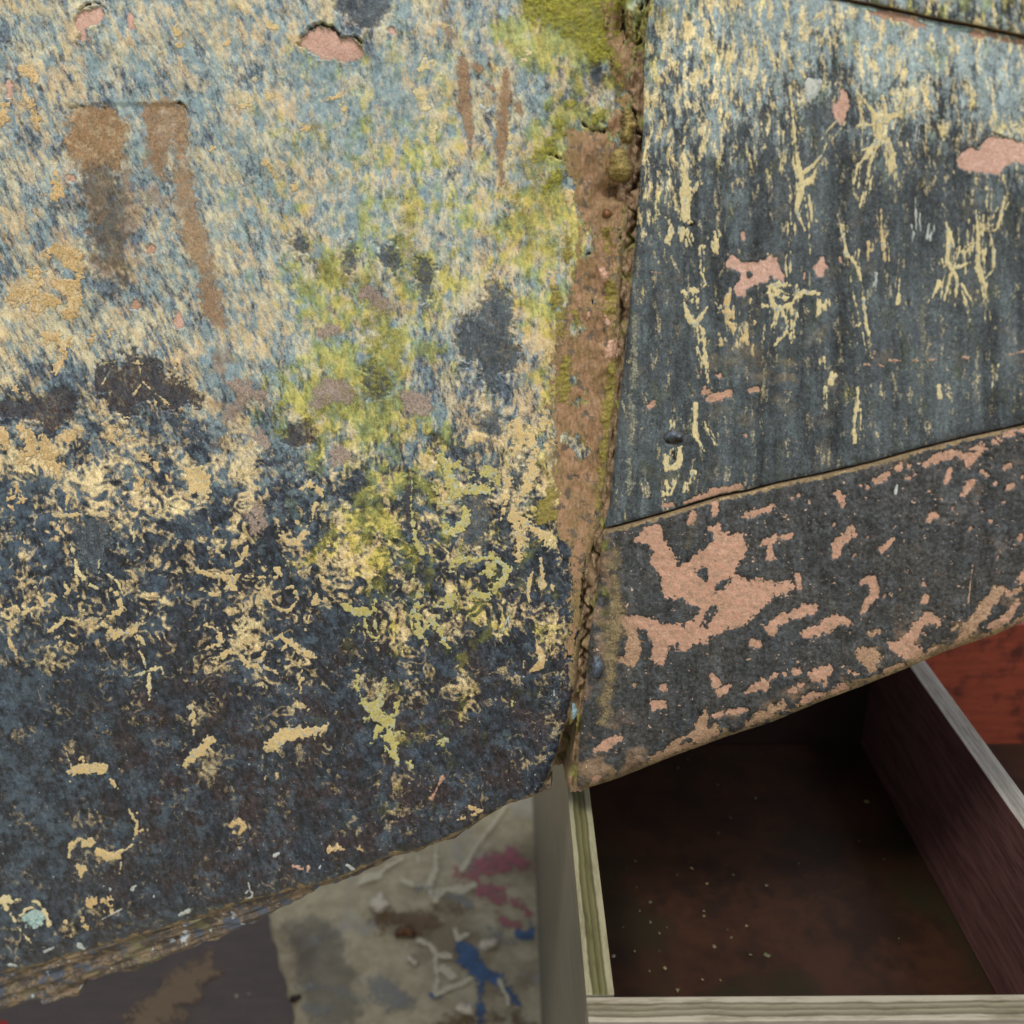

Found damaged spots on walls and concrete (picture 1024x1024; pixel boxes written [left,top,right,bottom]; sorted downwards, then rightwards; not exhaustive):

corrosion [63,94,228,328]
corrosion [456,55,523,185]
peeling [664,72,920,453]
peeling [956,136,1024,175]
peeling [7,493,164,701]
peeling [200,622,317,694]
peeling [195,475,332,631]
peeling [262,708,329,759]
peeling [353,668,414,769]
peeling [615,446,886,667]
peeling [643,569,1024,766]
peeling [859,428,1024,525]